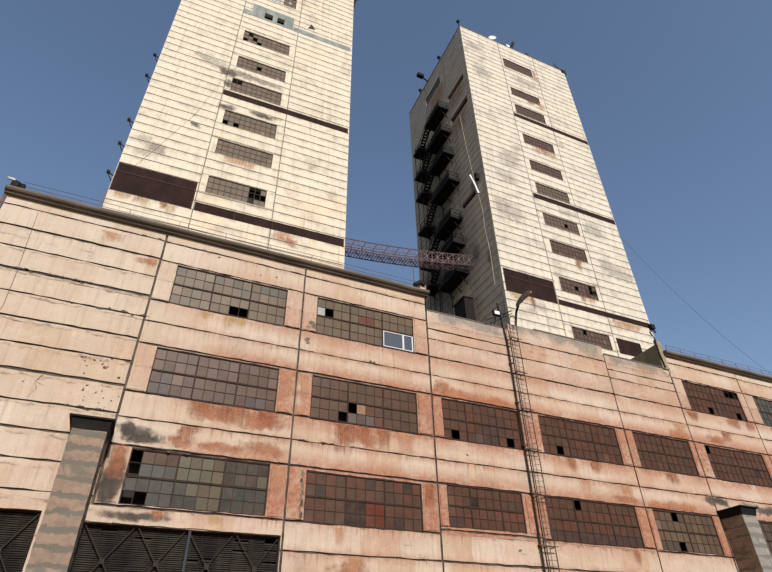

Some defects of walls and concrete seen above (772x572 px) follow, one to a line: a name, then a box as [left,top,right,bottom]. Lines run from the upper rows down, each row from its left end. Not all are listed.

corrosion [192,401,281,430]
corrosion [169,426,199,447]
corrosion [199,443,239,452]